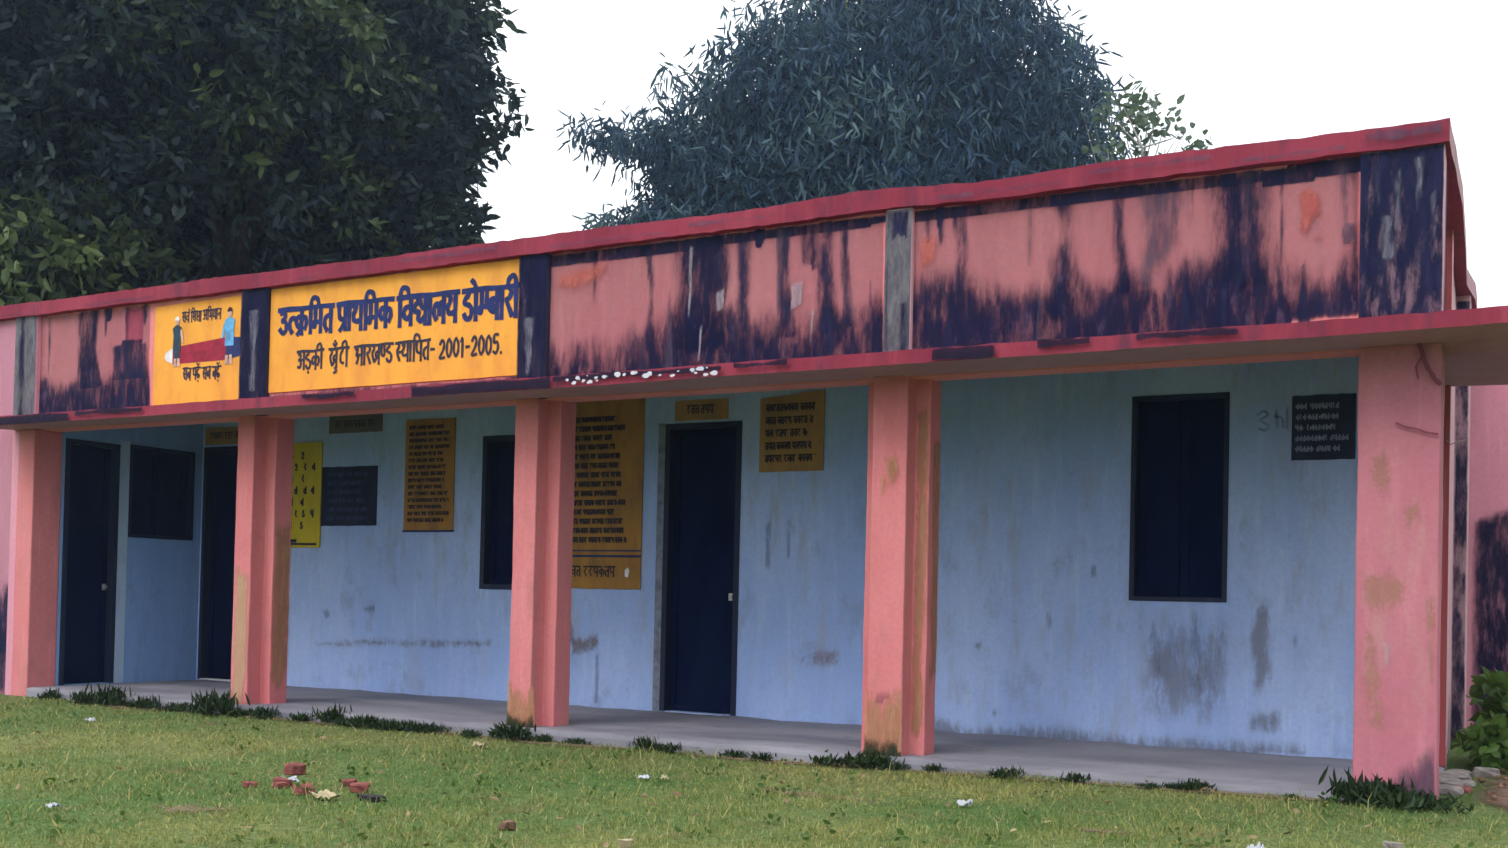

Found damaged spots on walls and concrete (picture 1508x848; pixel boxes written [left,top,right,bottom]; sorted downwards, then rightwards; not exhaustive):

damp [302,123,1470,399]
damp [0,298,150,425]
damp [238,288,284,399]
damp [0,586,8,694]